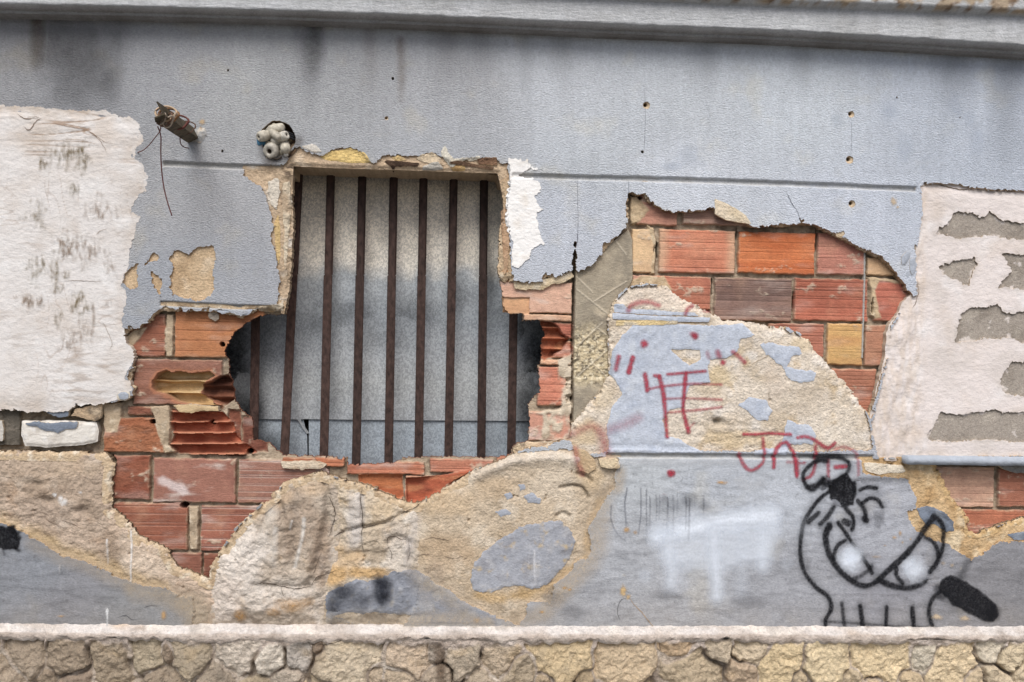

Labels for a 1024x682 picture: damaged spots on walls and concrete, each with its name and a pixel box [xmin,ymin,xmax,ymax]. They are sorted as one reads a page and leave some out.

spalling [0,143,1024,625]